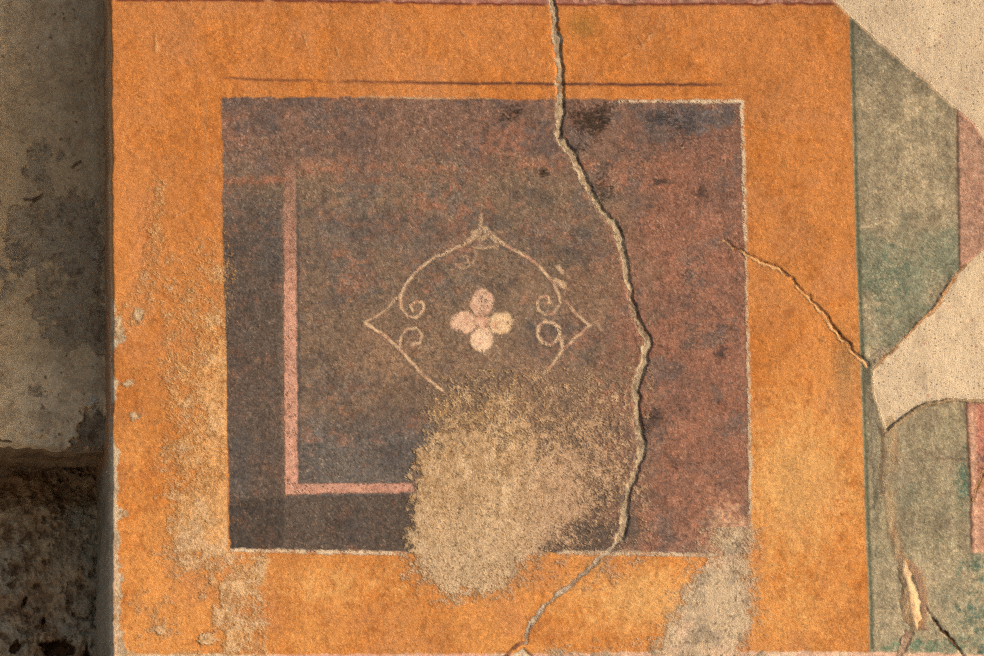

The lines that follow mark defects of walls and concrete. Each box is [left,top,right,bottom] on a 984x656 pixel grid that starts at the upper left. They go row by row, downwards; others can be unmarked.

spalling [835,0,984,139]
crack [522,0,652,645]
crack [722,240,867,368]
spalling [873,250,984,436]
peeling [400,366,652,609]
crack [972,469,984,502]
spalling [505,642,530,656]
peeling [637,527,770,656]
crack [897,617,960,656]